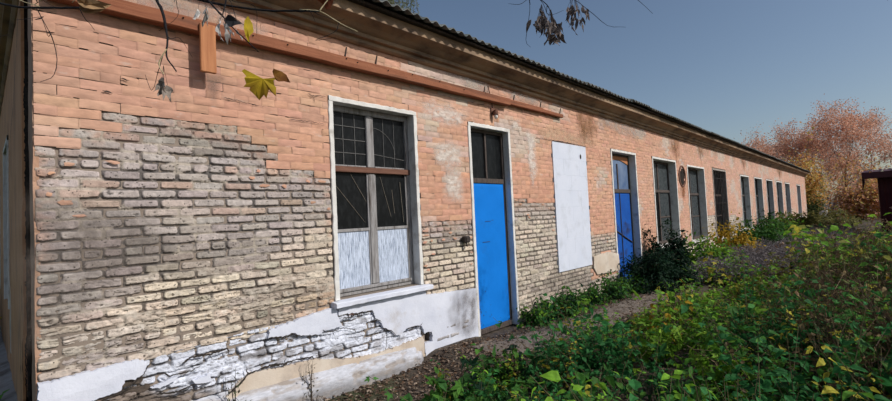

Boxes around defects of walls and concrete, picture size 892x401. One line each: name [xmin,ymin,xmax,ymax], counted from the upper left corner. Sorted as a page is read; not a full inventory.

peeling [35,112,422,401]